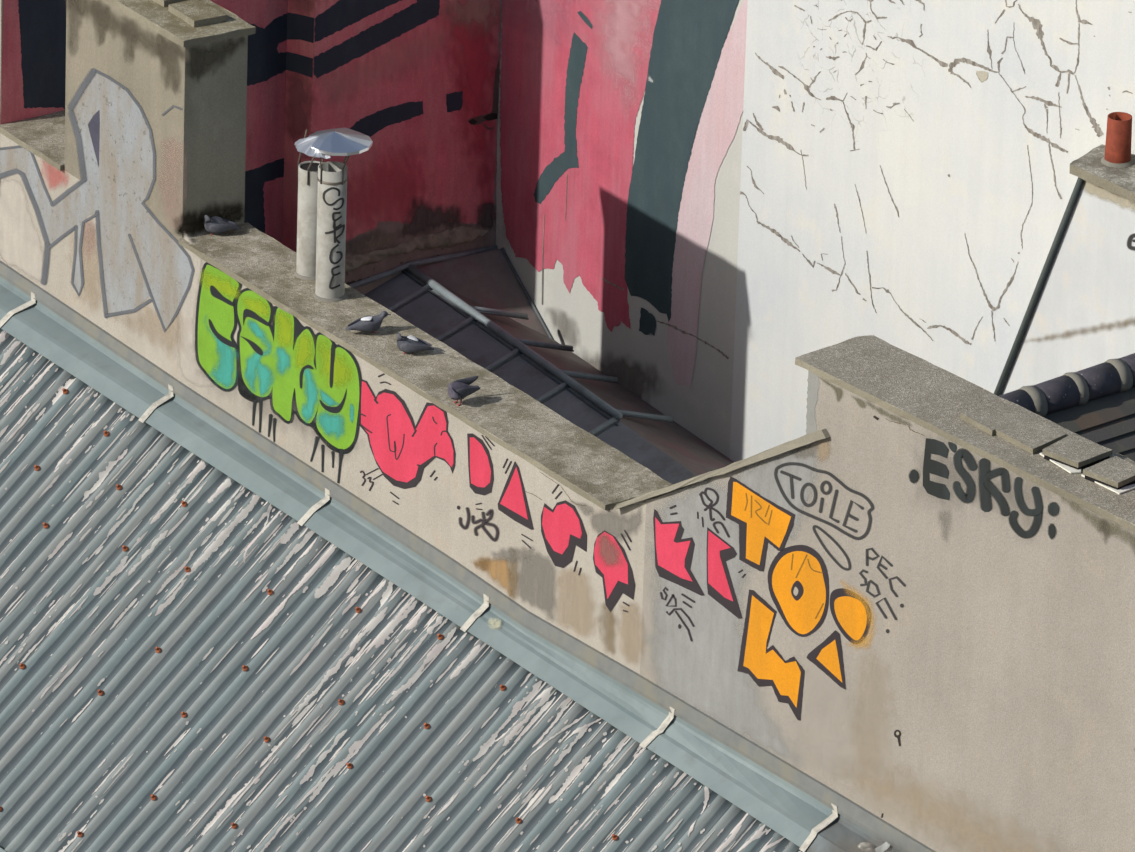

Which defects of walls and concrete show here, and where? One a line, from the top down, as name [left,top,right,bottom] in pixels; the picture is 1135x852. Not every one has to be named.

leakage [68,0,244,91]
leakage [176,204,242,235]
crack [740,0,1131,345]
peeling [0,331,501,852]
peeling [458,673,801,852]